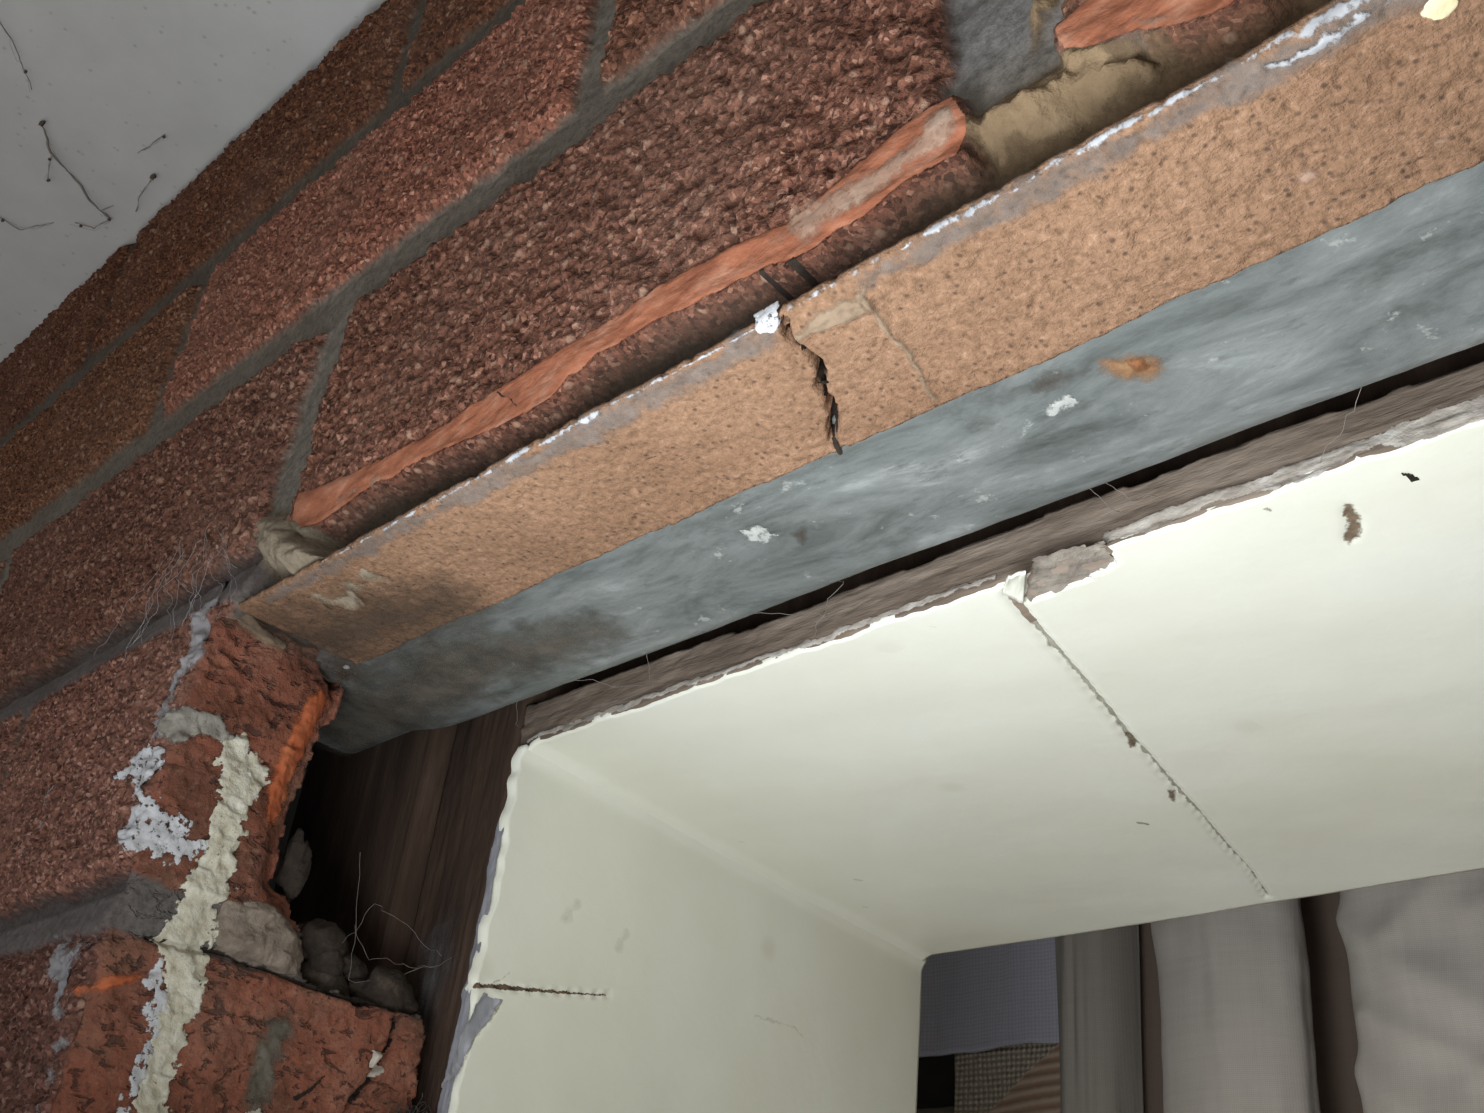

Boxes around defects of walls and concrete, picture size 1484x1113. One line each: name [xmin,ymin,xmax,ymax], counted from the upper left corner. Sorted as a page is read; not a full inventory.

crack [759,257,843,455]
peeling [527,394,1484,743]
spalling [267,689,327,824]
crack [1009,598,1268,895]
crack [473,982,606,996]